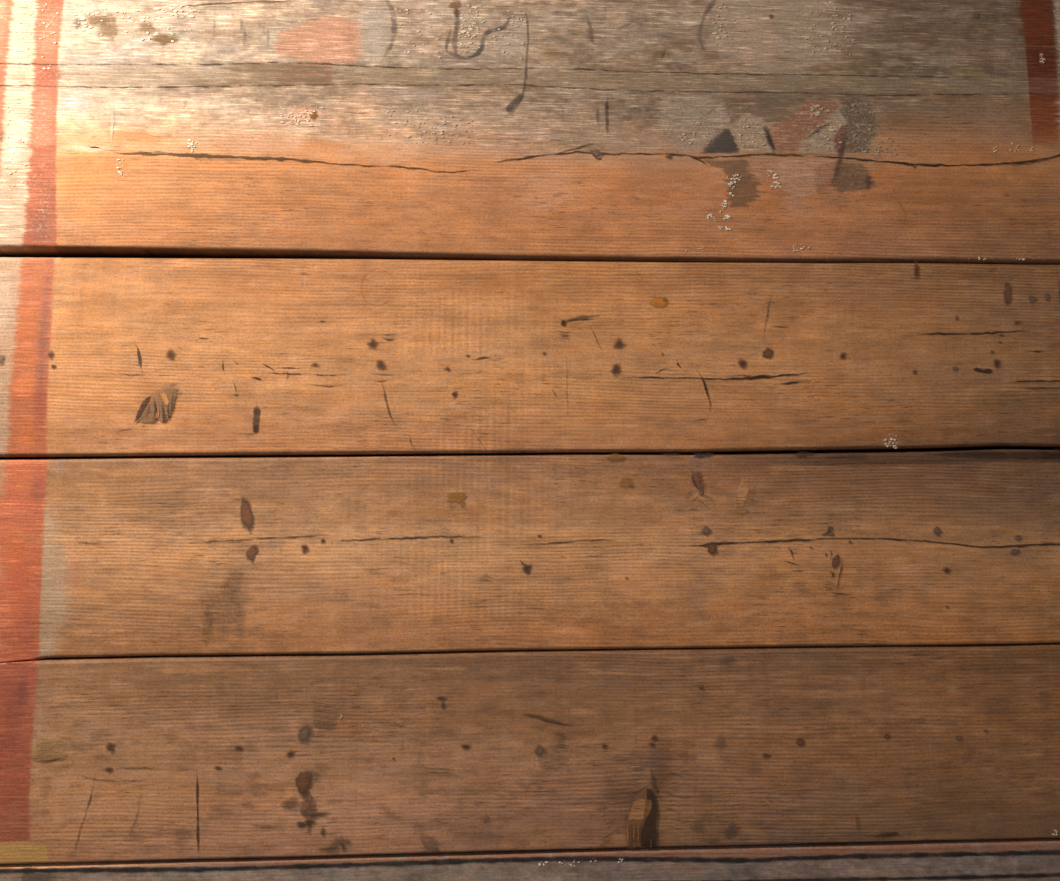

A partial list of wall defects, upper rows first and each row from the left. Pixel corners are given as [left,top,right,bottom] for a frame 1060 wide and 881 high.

crack [88,146,469,173]
crack [497,145,1060,168]